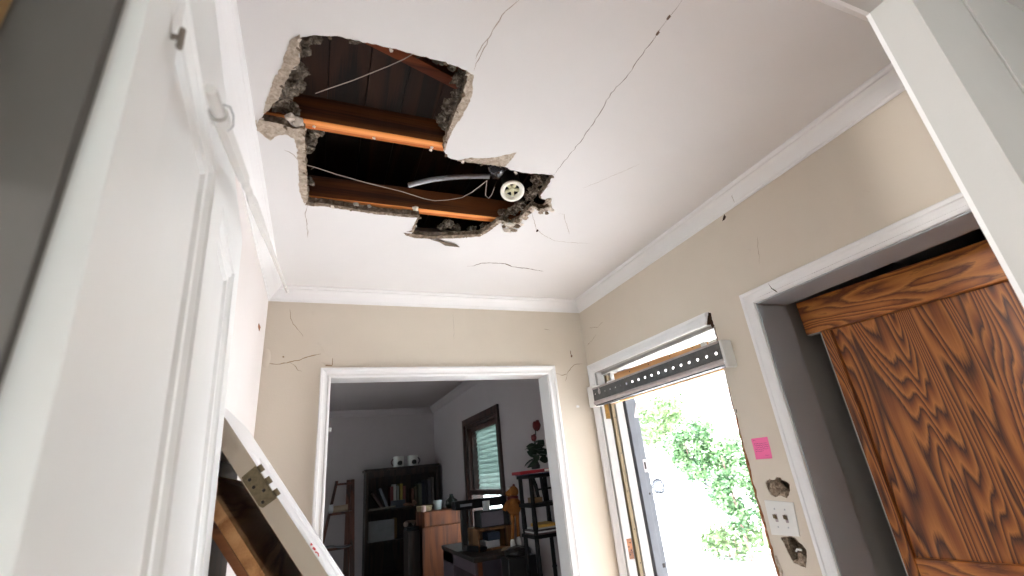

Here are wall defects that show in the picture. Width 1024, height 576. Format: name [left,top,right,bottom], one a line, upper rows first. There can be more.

flaking render [255,35,554,247]
crack [474,0,519,69]
crack [556,2,681,172]
crack [269,312,319,371]
flaking render [728,387,807,576]